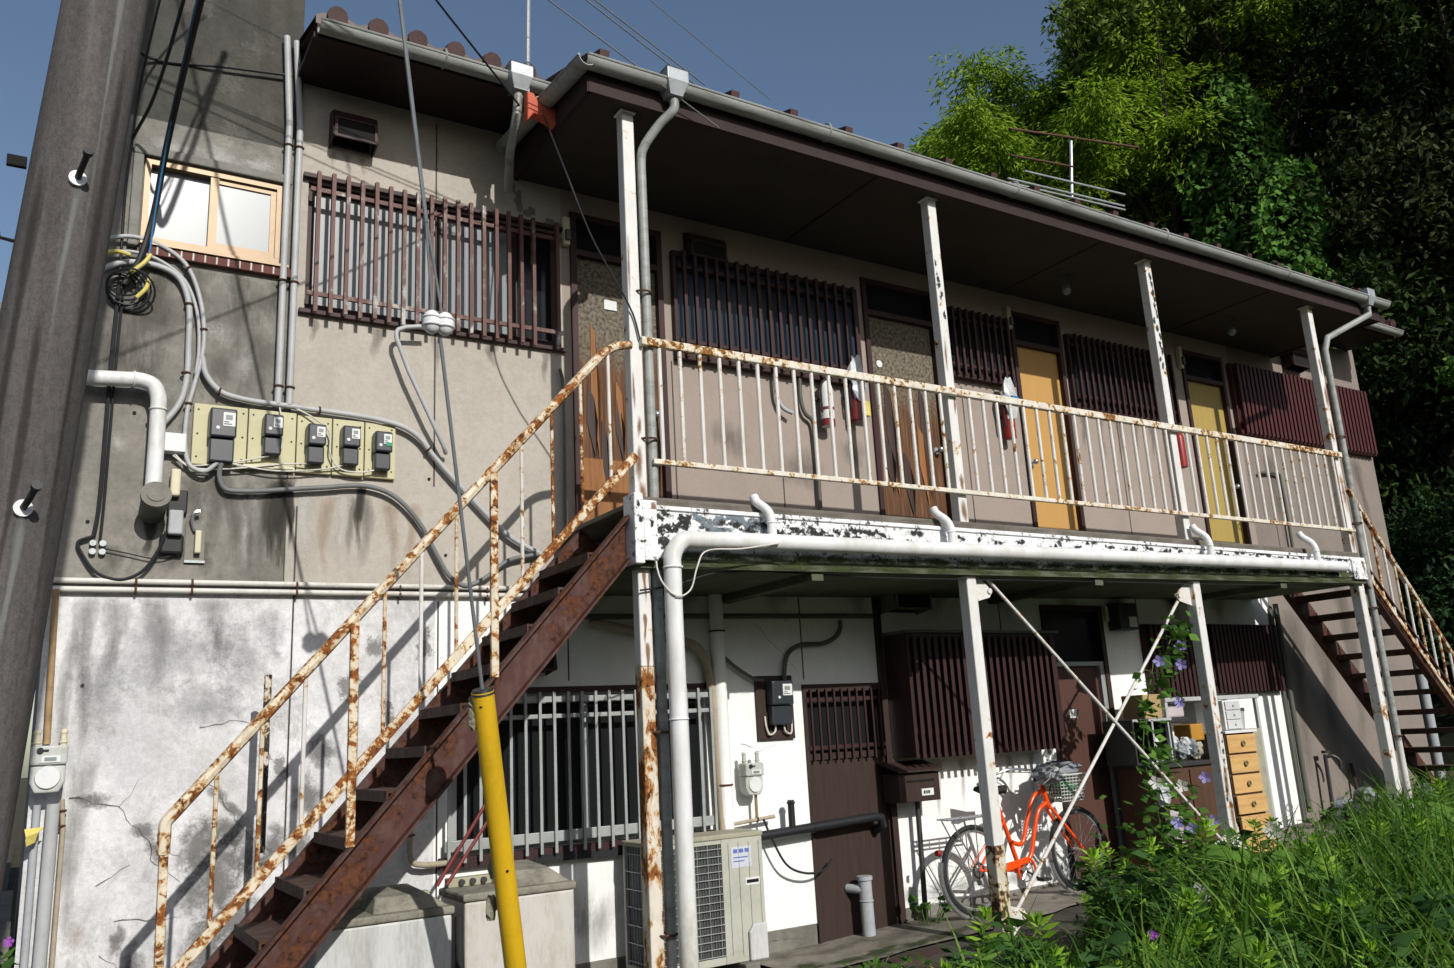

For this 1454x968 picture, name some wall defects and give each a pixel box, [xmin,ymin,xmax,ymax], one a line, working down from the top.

corrosion [637,450,656,509]
damp [338,488,366,544]
peeling [636,499,931,549]
damp [365,637,382,655]
damp [417,627,431,656]
damp [338,677,362,701]
damp [79,794,101,806]
damp [299,785,320,813]
crack [69,781,182,922]
damp [135,824,159,857]
damp [182,788,308,968]
damp [110,928,140,968]